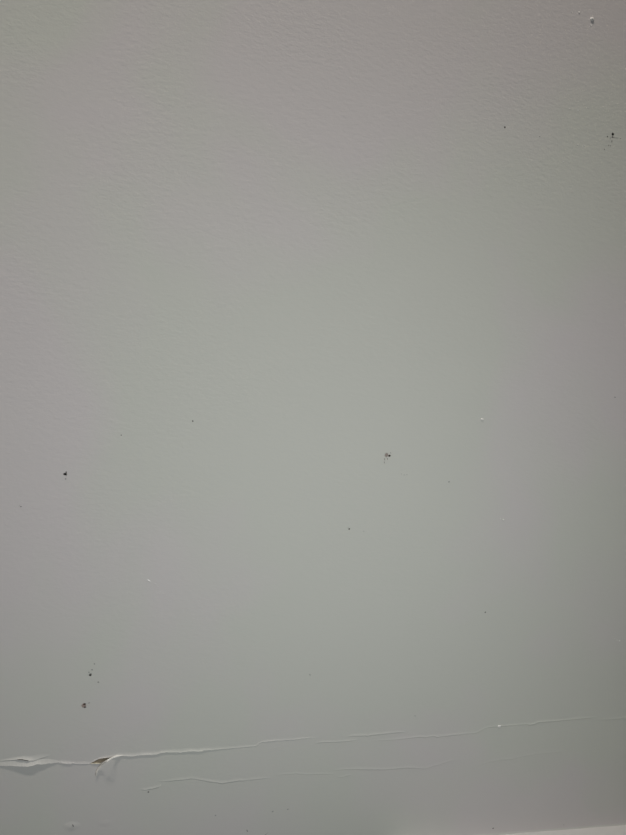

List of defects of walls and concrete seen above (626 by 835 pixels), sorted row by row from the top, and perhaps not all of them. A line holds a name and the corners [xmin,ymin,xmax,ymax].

crack [0,716,626,775]